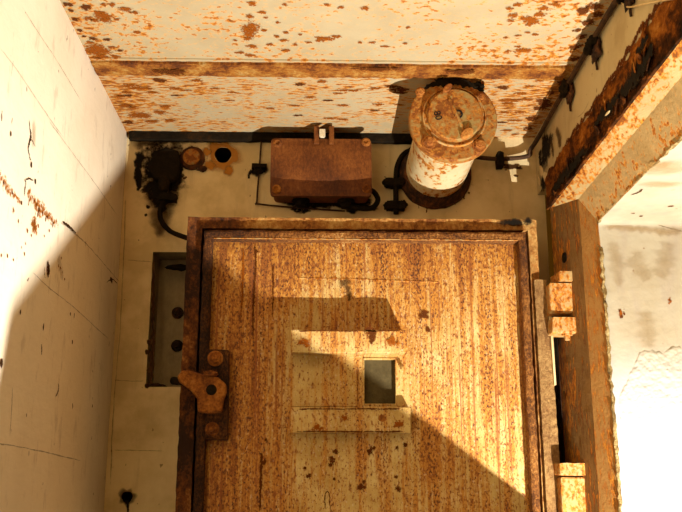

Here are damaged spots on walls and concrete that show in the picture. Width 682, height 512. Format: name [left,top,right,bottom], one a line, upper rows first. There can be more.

corrosion [63,2,138,23]
corrosion [77,29,124,58]
corrosion [233,1,269,57]
corrosion [505,2,560,39]
corrosion [114,69,201,124]
corrosion [371,85,409,94]
corrosion [497,80,562,136]
corrosion [562,2,660,148]
corrosion [198,142,239,175]
corrosion [0,172,57,237]